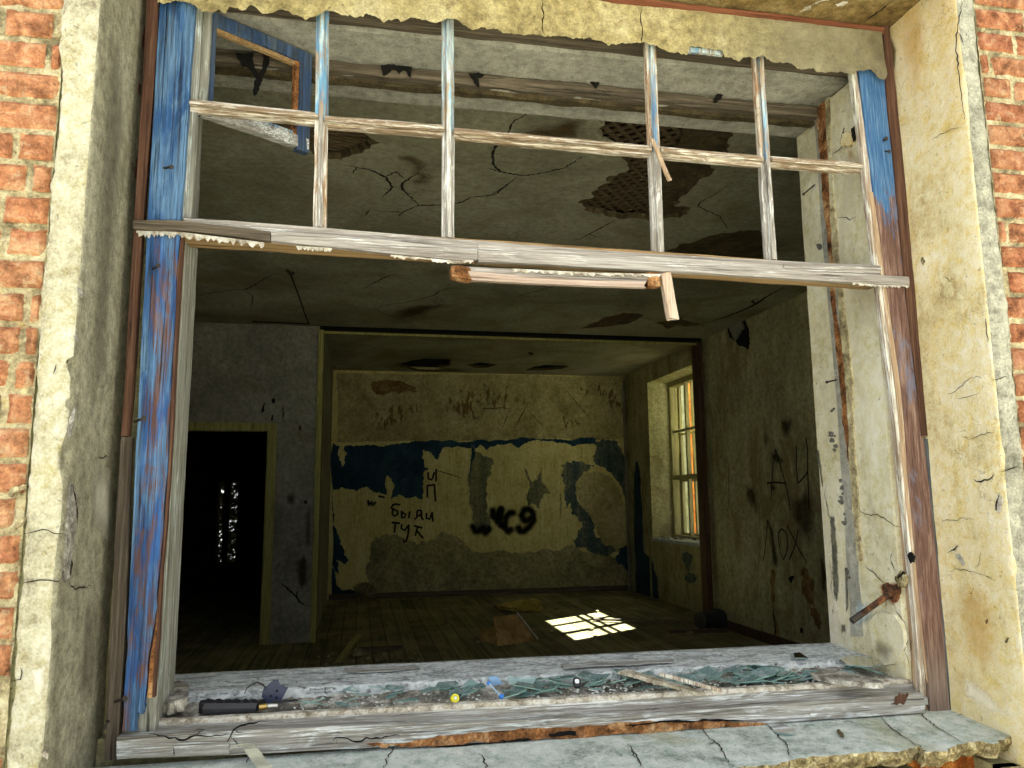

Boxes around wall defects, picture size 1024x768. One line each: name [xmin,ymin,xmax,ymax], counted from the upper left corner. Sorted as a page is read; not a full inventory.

crack [345,90,720,216]
flaking render [331,373,659,599]
crack [884,714,962,751]